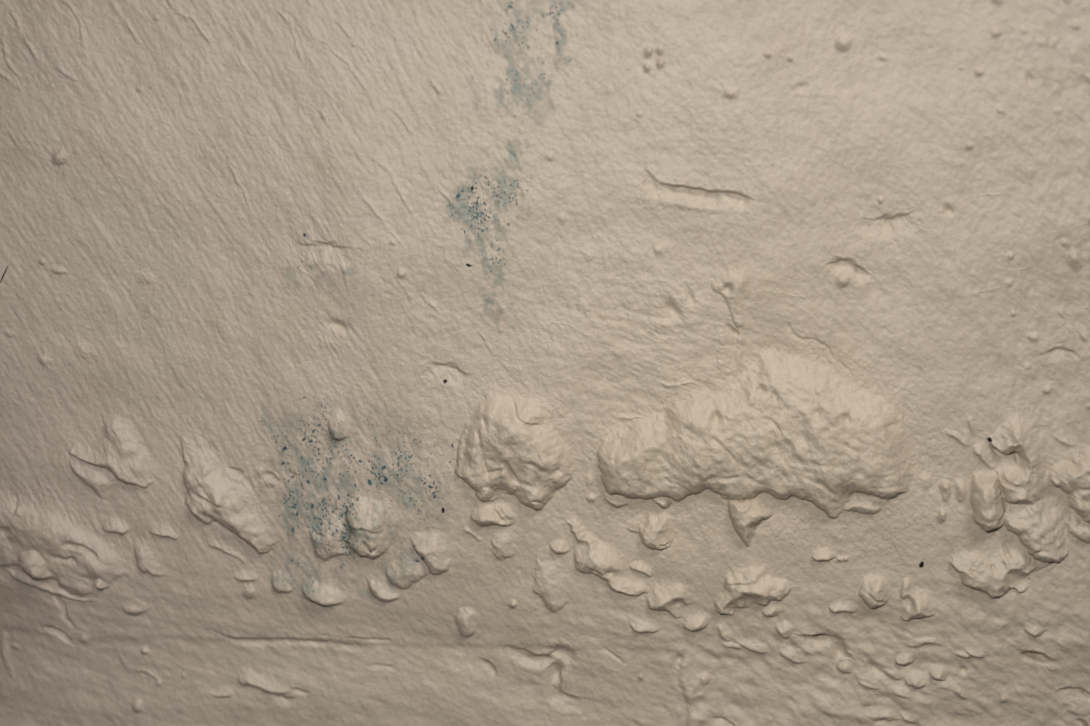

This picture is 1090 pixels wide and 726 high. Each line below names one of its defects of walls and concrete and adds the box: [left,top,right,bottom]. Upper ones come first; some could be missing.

leakage [494,2,565,55]
leakage [449,175,531,279]